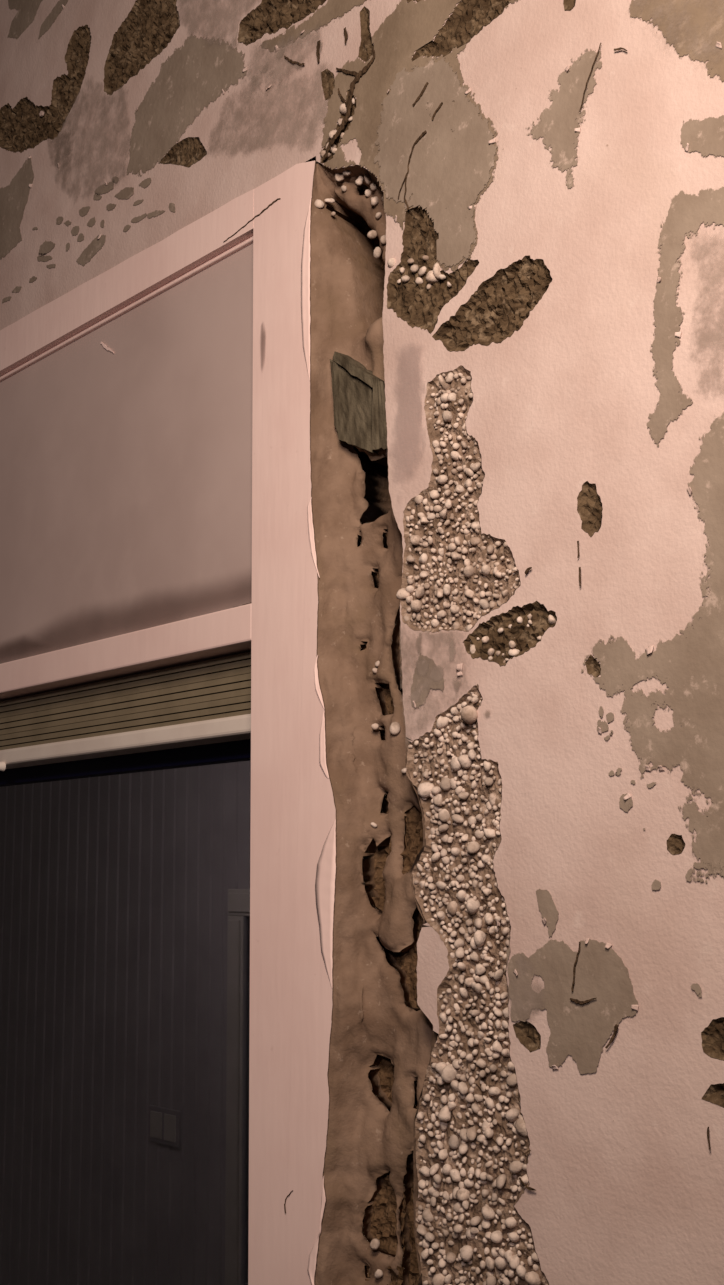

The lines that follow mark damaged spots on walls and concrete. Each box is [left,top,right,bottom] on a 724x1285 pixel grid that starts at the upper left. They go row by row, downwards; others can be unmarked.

peeling [629,0,724,81]
crack [284,27,375,160]
flaking render [0,25,91,259]
peeling [680,115,724,157]
peeling [2,276,37,303]
peeling [37,241,56,269]
peeling [56,206,106,266]
peeling [647,187,724,447]
flaking render [78,0,639,1285]
peeling [581,413,724,883]
flaking render [701,1017,724,1060]
flaking render [701,1083,724,1107]